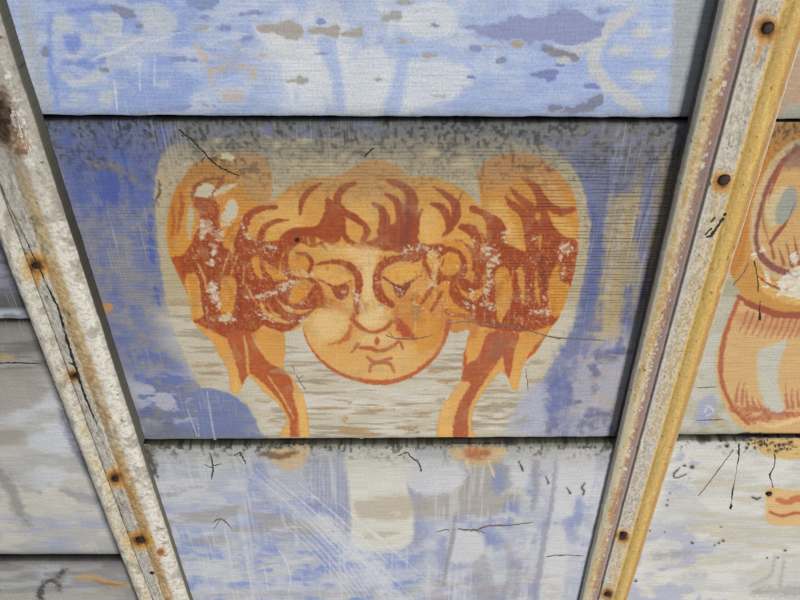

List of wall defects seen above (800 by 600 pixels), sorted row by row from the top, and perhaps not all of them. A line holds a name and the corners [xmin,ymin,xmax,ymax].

peeling [463,3,612,85]
corrosion [745,9,788,68]
corrosion [0,81,38,164]
crack [178,129,239,176]
corrosion [706,165,738,199]
peeling [193,181,278,267]
corrosion [16,245,55,291]
crack [0,185,97,425]
peeling [204,277,239,325]
peeling [462,221,512,324]
crack [698,444,740,509]
crack [437,522,531,533]